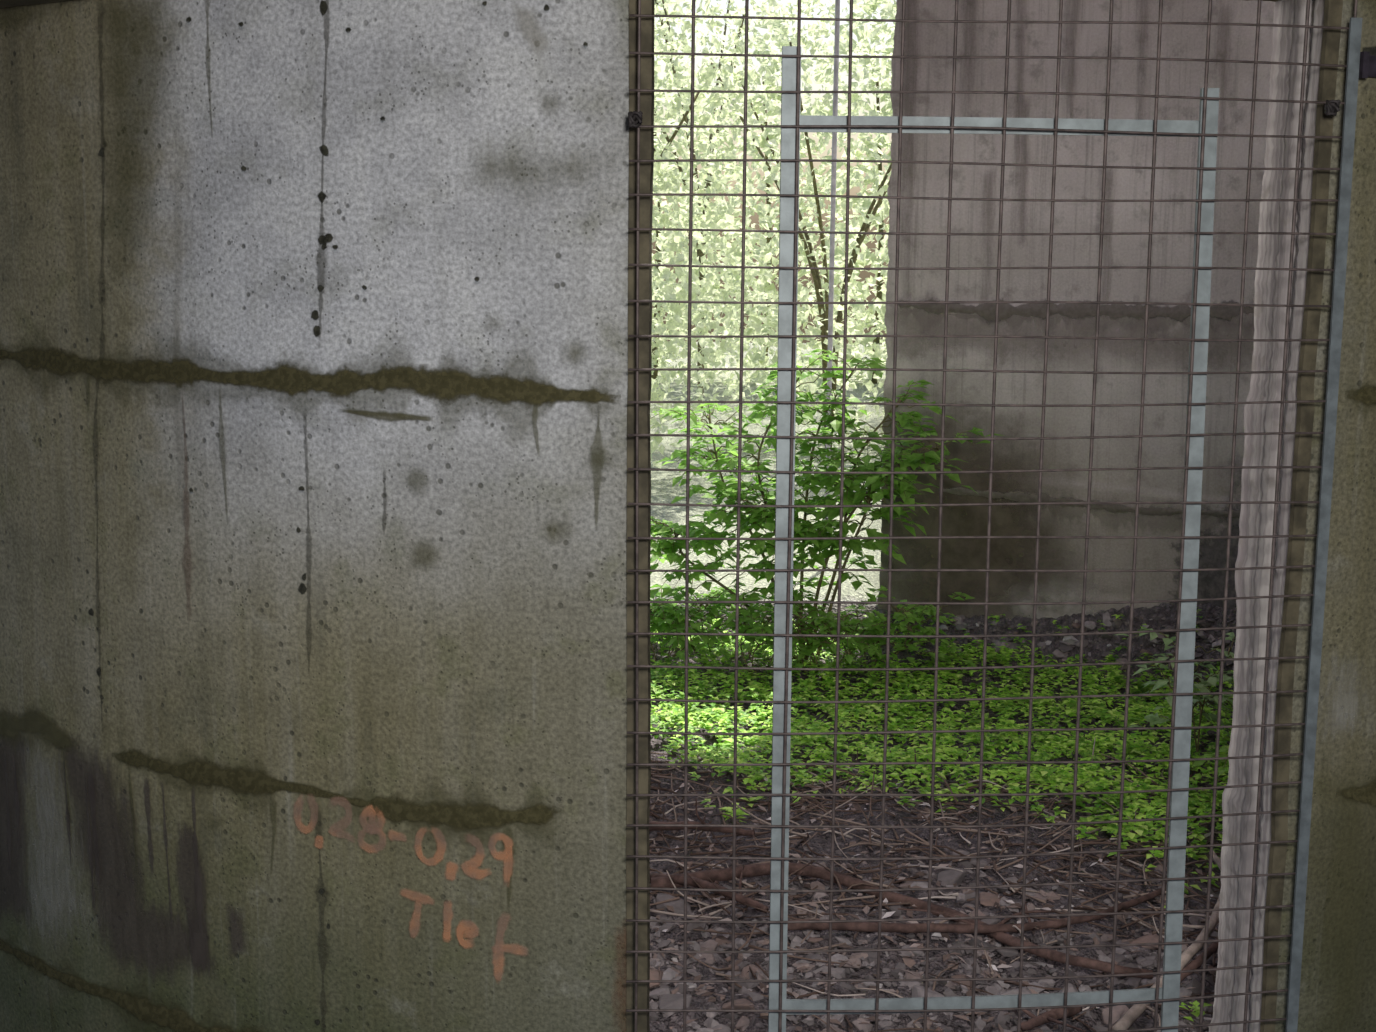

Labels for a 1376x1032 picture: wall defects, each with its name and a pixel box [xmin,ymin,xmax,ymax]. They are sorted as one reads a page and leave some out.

leakage [0,737,26,917]
leakage [64,747,208,975]